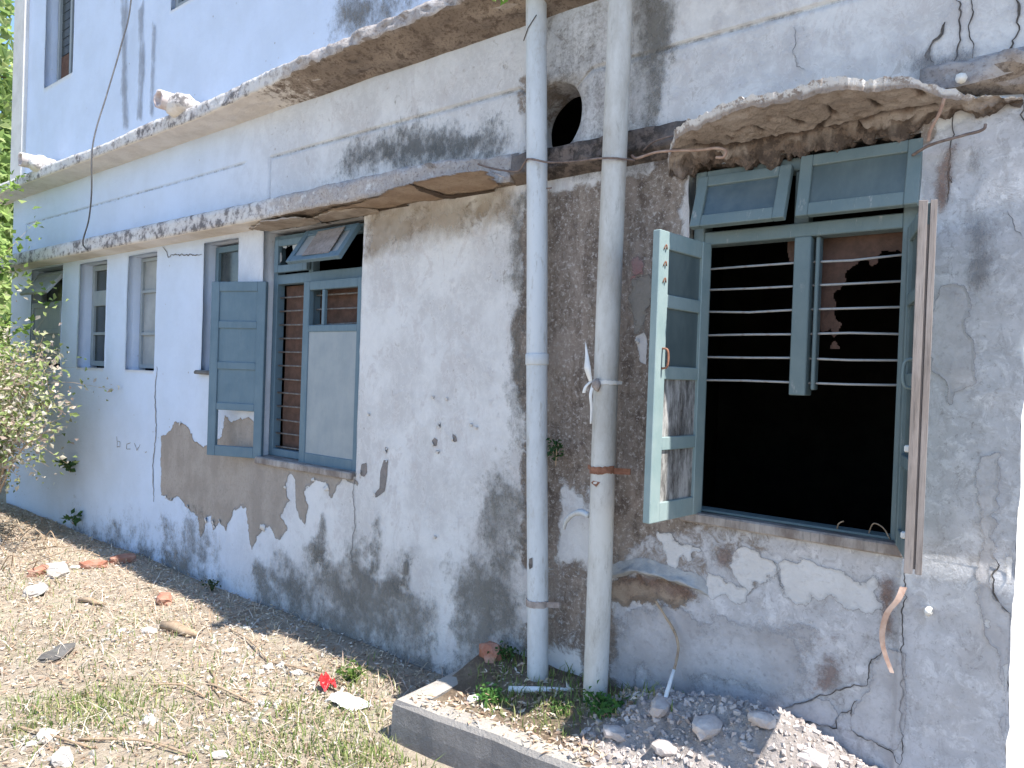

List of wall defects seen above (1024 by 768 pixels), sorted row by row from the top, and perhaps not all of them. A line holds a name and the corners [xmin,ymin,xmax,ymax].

leakage [338,0,410,31]
crack [924,0,974,61]
crack [1009,0,1021,49]
leakage [341,115,508,176]
spalling [249,170,502,231]
flaking render [160,416,367,548]
peeling [373,447,388,497]
leakage [252,475,524,673]
peeling [706,546,883,614]
corrosion [881,580,893,632]
crack [991,556,1009,613]
crack [782,573,907,765]